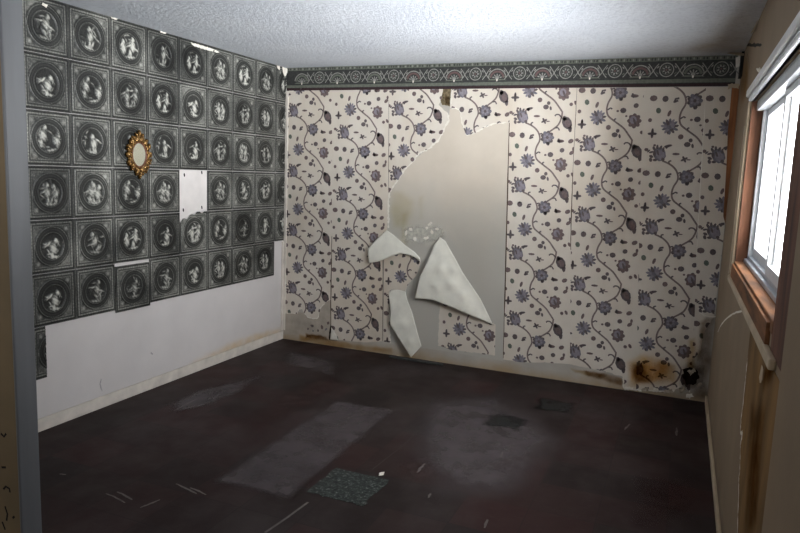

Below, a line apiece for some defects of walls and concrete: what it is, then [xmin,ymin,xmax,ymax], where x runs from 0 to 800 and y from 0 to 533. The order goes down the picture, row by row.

peeling [179,170,207,222]
damp [634,365,645,381]